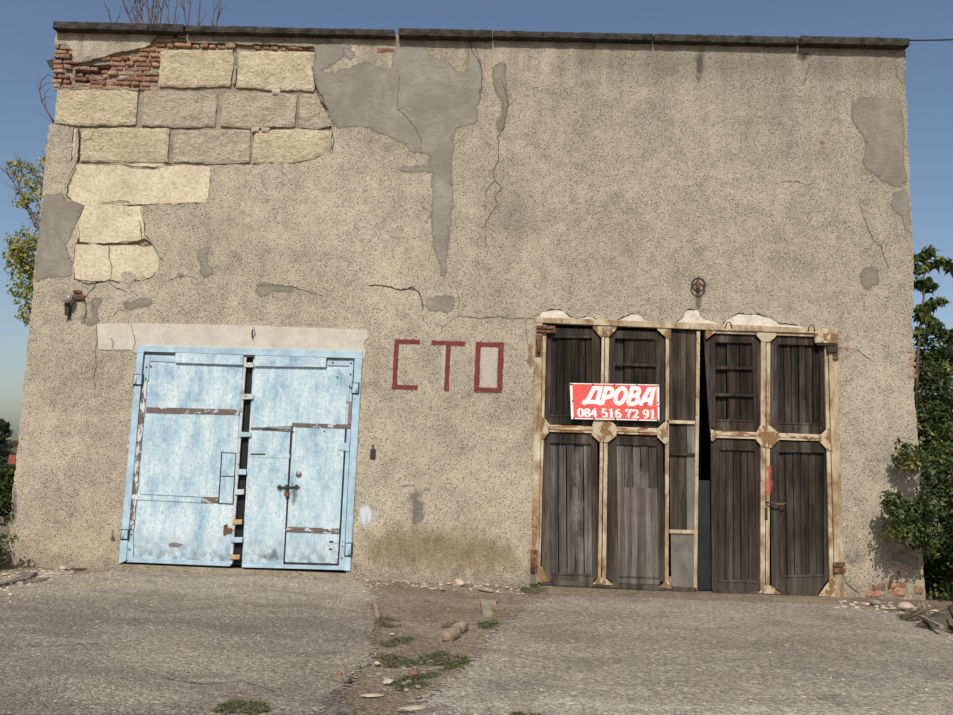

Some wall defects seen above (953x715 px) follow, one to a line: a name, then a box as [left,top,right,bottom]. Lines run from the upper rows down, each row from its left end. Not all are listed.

spalling [52,36,332,284]
crack [469,41,515,248]
crack [368,284,636,344]
spalling [865,581,923,599]